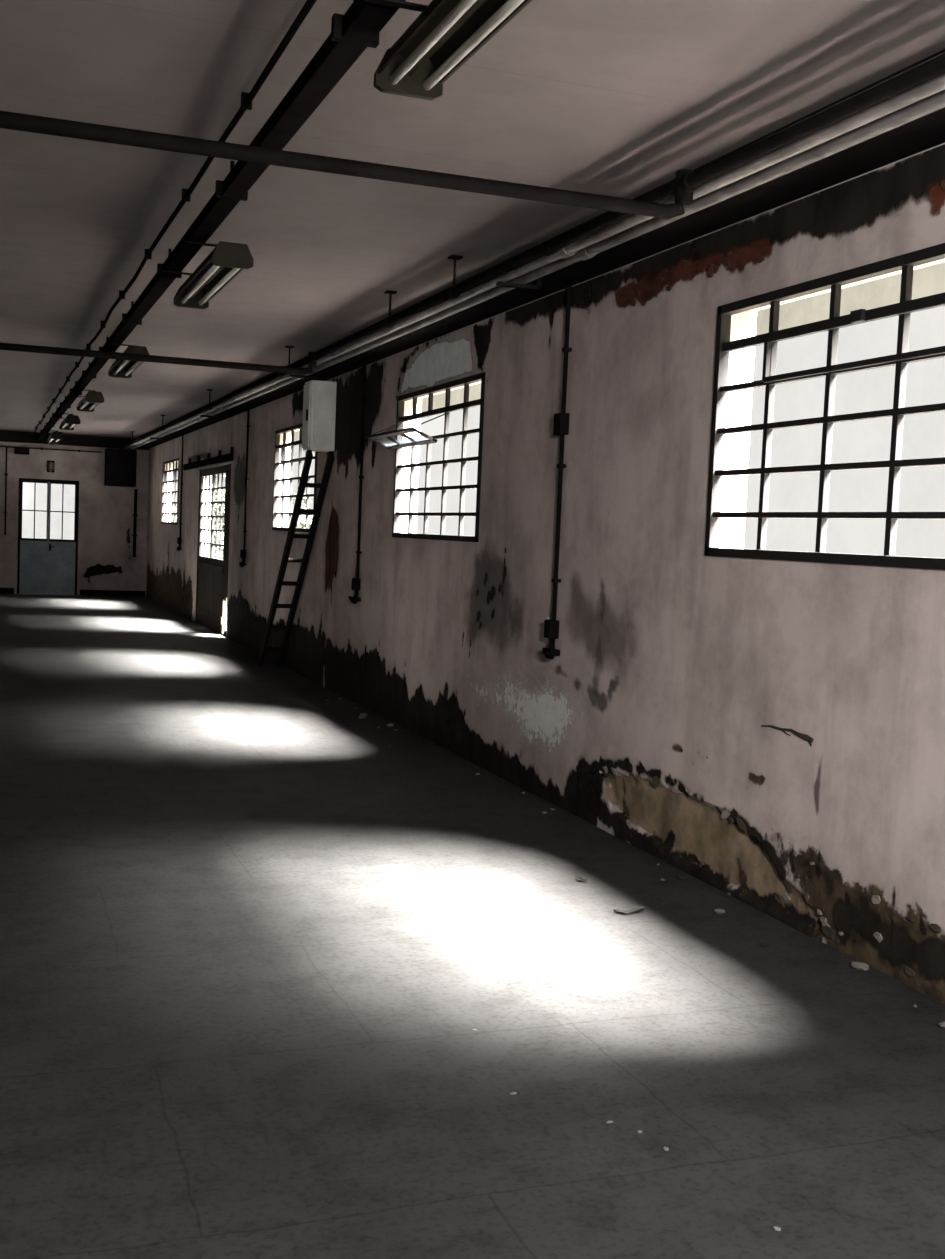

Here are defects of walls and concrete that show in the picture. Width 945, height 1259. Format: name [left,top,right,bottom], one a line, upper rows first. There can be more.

peeling [615,237,772,308]
peeling [929,180,945,215]
water stain [227,547,625,826]
flaking render [576,757,835,939]